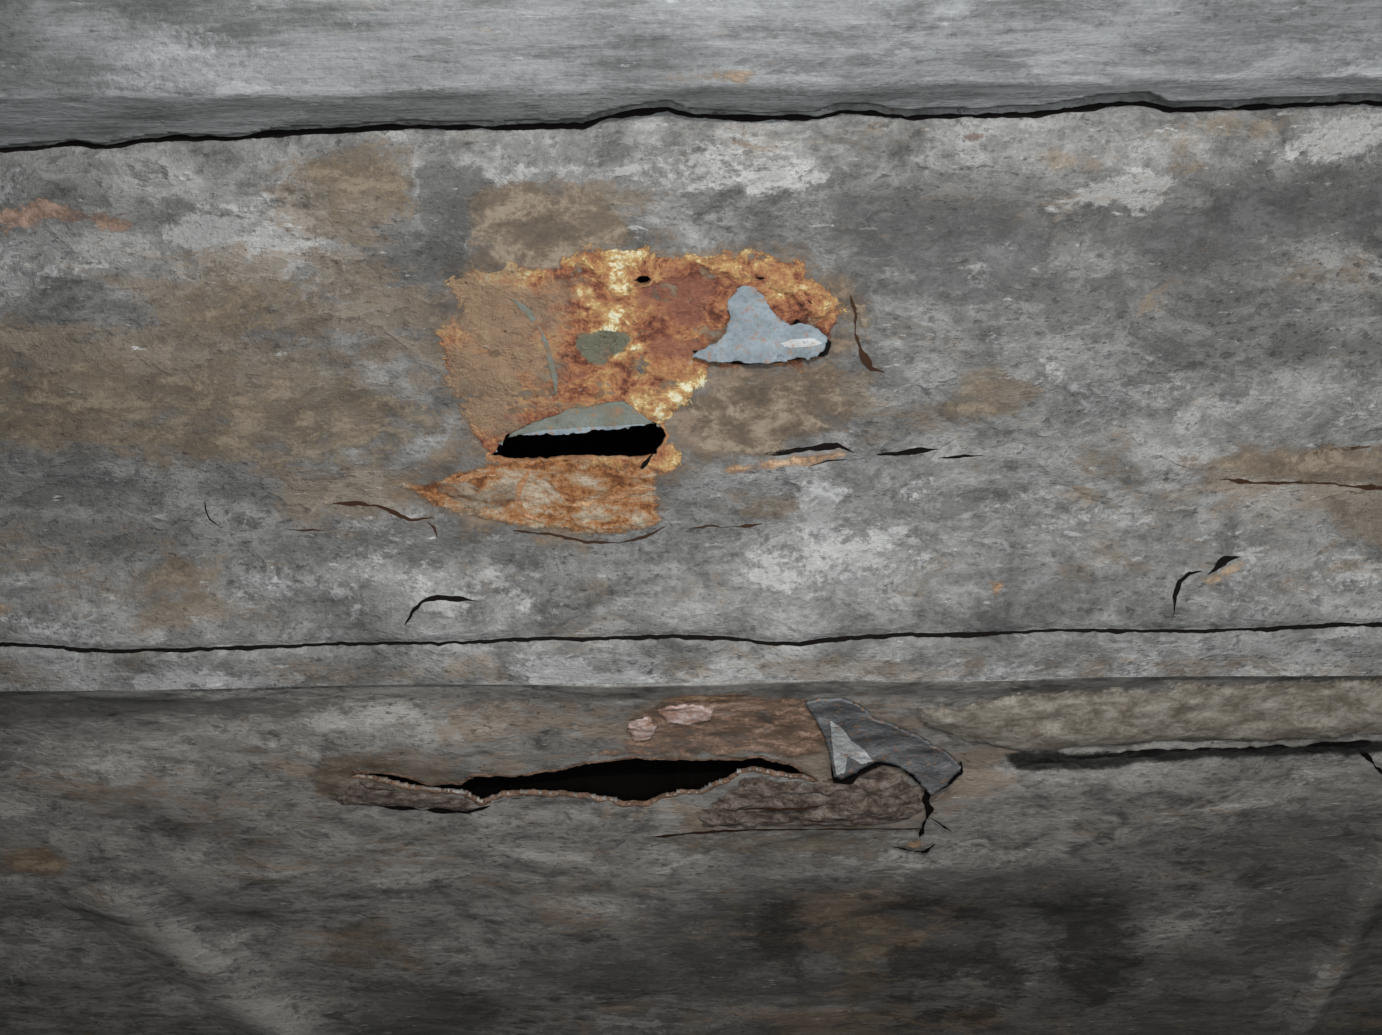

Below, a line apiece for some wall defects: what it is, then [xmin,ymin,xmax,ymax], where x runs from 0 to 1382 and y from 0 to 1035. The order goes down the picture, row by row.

crack [0,100,1382,153]
corrosion [308,141,415,218]
peeling [692,285,831,365]
corrosion [0,242,864,532]
peeling [498,401,660,445]
crack [760,442,982,467]
spalling [398,458,664,544]
crack [0,556,1382,654]